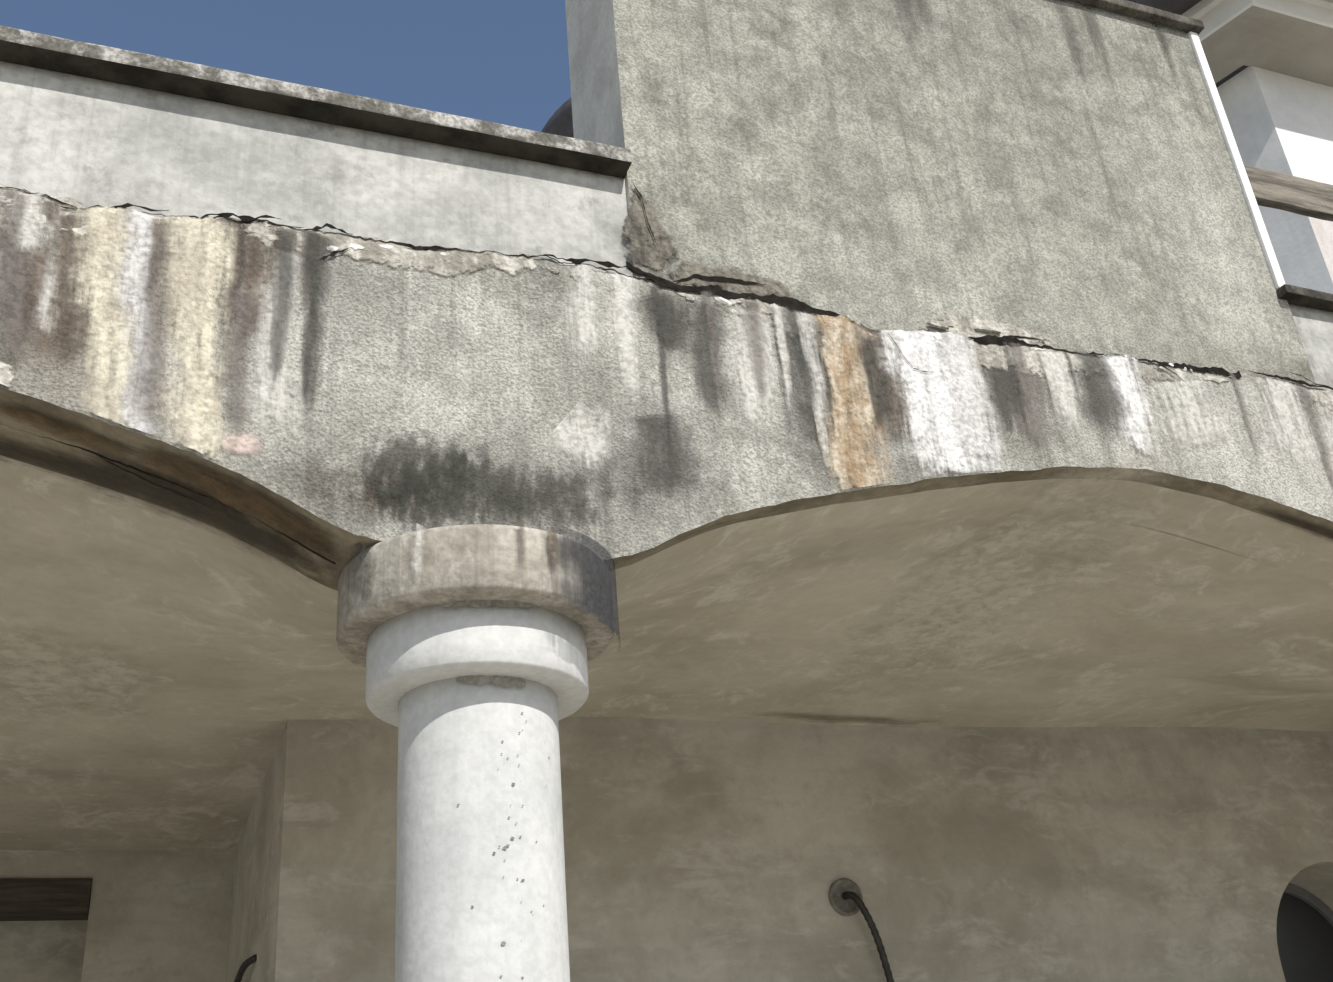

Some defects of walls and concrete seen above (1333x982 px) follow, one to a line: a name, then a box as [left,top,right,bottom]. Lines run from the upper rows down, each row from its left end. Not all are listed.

water stain [0,190,327,459]
crack [0,187,928,372]
water stain [613,274,682,485]
flaking render [624,182,826,337]
water stain [739,300,835,448]
rust [816,314,888,490]
water stain [862,327,1040,474]
flaking render [921,312,1193,384]
water stain [1041,350,1152,453]
crack [926,321,1333,390]
crack [1,424,336,564]
water stain [368,439,620,638]